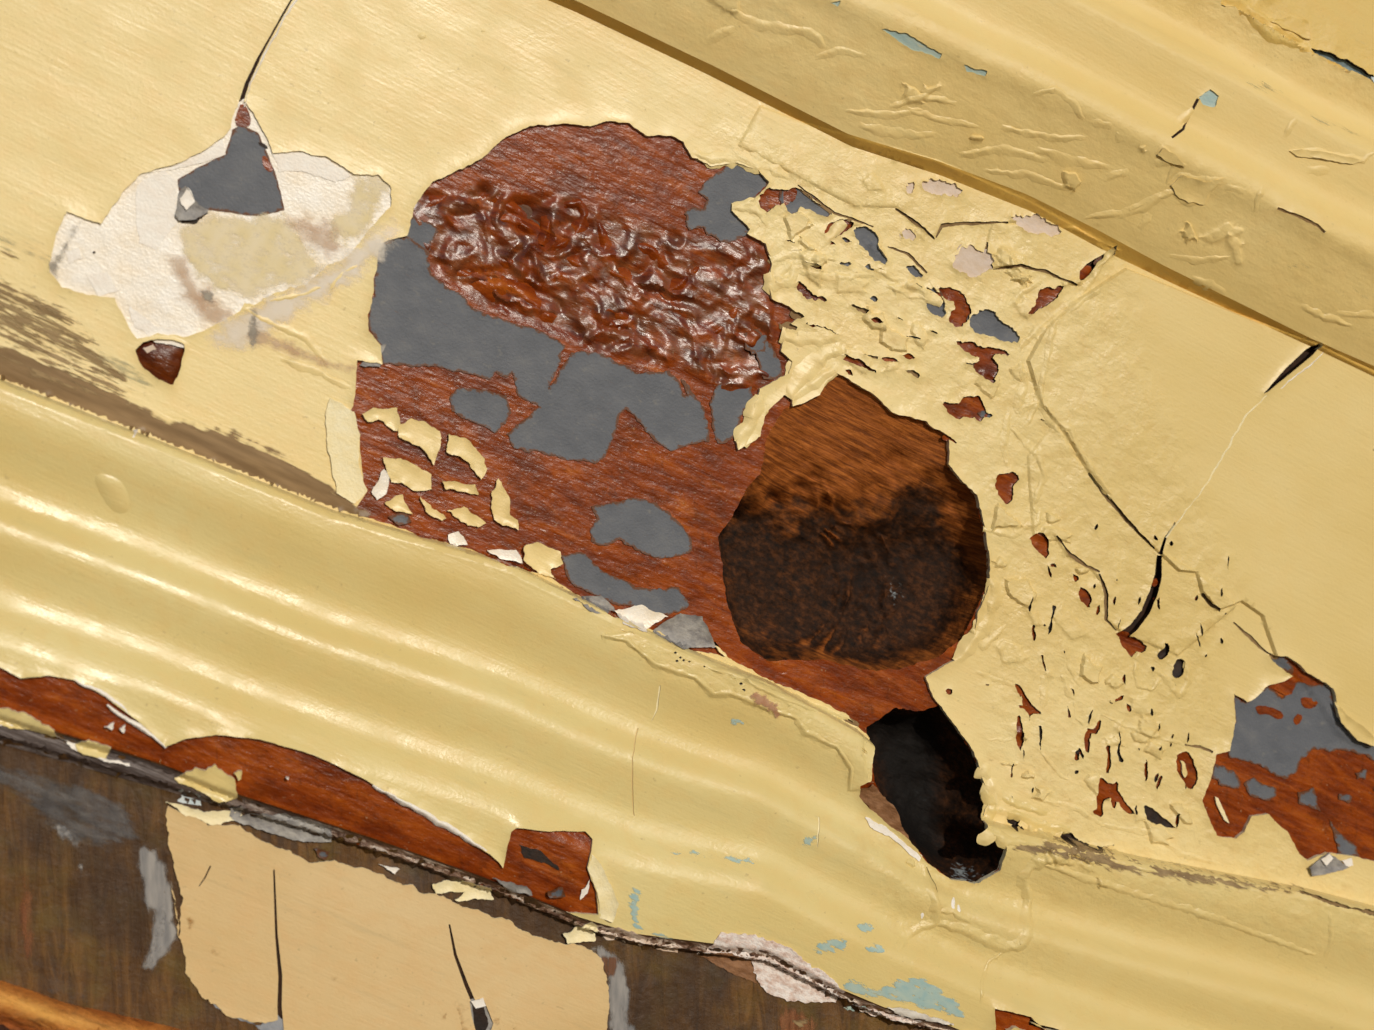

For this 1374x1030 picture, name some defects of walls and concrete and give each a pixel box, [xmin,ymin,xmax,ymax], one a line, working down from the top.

crack [239,0,298,107]
peeling [49,90,1374,877]
crack [1056,344,1323,699]
crack [1185,744,1212,752]
peeling [0,668,678,1030]
peeling [697,932,954,1030]
peeling [995,1009,1045,1030]